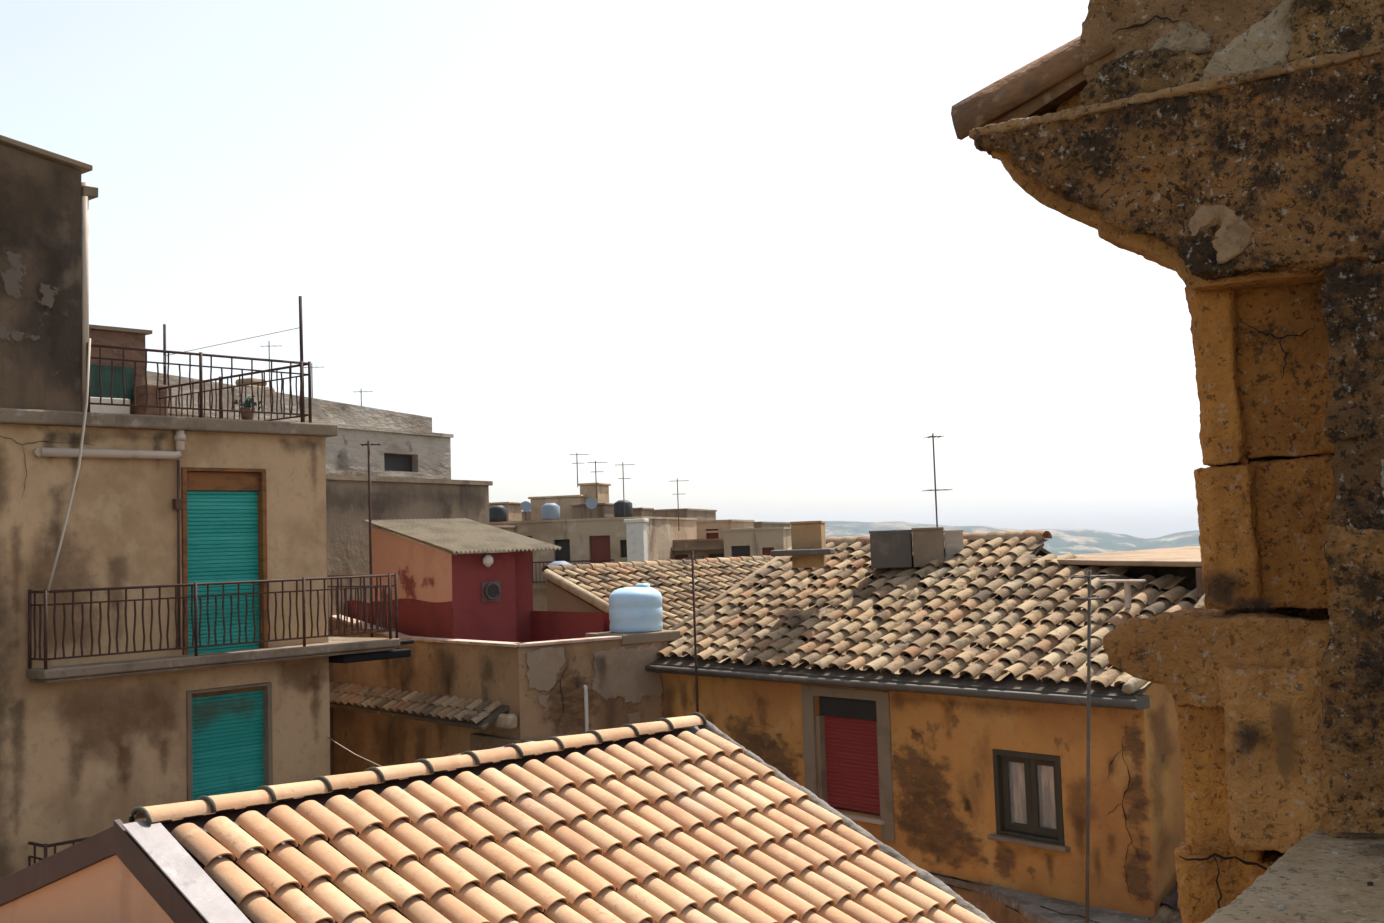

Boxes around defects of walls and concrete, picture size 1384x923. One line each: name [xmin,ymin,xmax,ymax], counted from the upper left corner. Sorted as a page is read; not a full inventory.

crack [1112,15,1179,35]
flaking render [1,251,61,308]